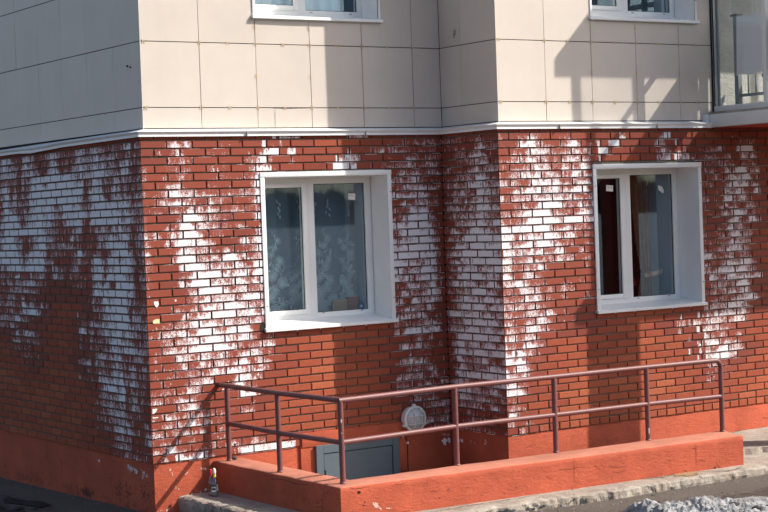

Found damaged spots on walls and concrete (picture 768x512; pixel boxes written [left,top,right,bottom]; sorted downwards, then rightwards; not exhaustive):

leakage [0,132,768,479]